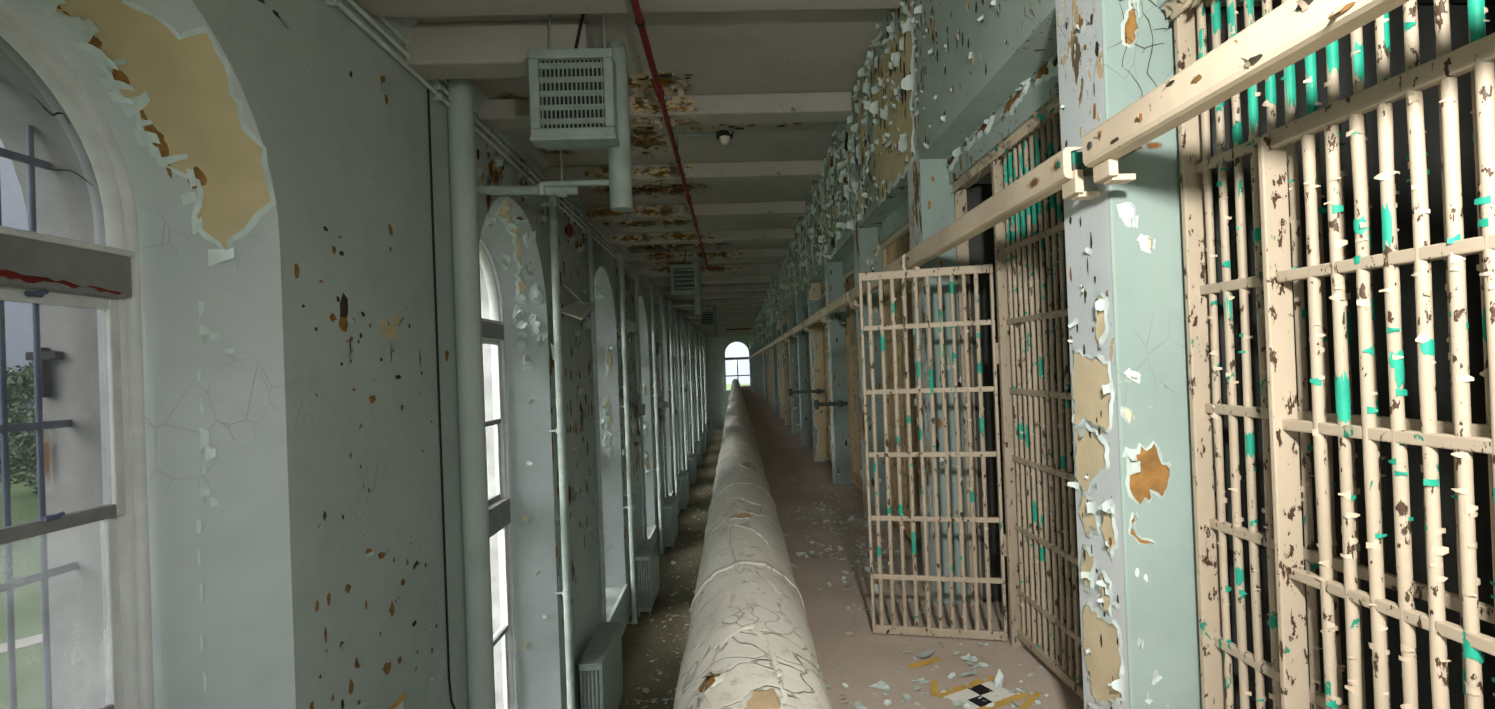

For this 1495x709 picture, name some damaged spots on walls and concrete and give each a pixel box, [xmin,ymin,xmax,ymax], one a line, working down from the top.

peeling [1065,13,1099,56]
crack [1108,0,1167,91]
peeling [29,0,277,267]
peeling [931,52,1067,197]
peeling [475,71,757,626]
peeling [750,0,1006,579]
peeling [1006,193,1172,709]
peeling [697,671,727,698]
peeling [740,687,785,709]